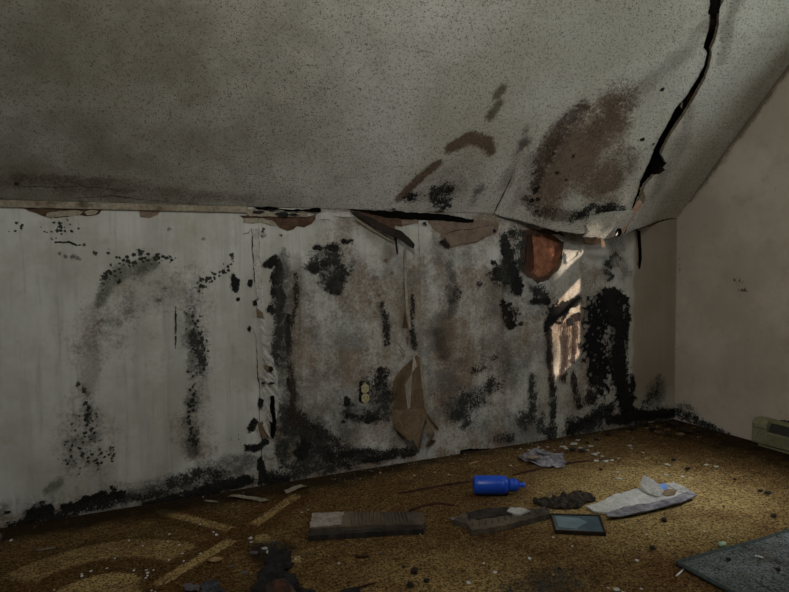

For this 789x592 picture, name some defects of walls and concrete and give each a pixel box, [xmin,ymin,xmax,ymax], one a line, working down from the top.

leakage [387,131,495,213]
leakage [486,85,506,120]
leakage [529,81,637,225]
crack [622,0,724,269]
mould [40,218,176,291]
spalling [239,206,499,249]
mould [446,262,464,314]
mould [476,226,730,443]
mould [4,238,418,527]
mould [429,354,505,432]